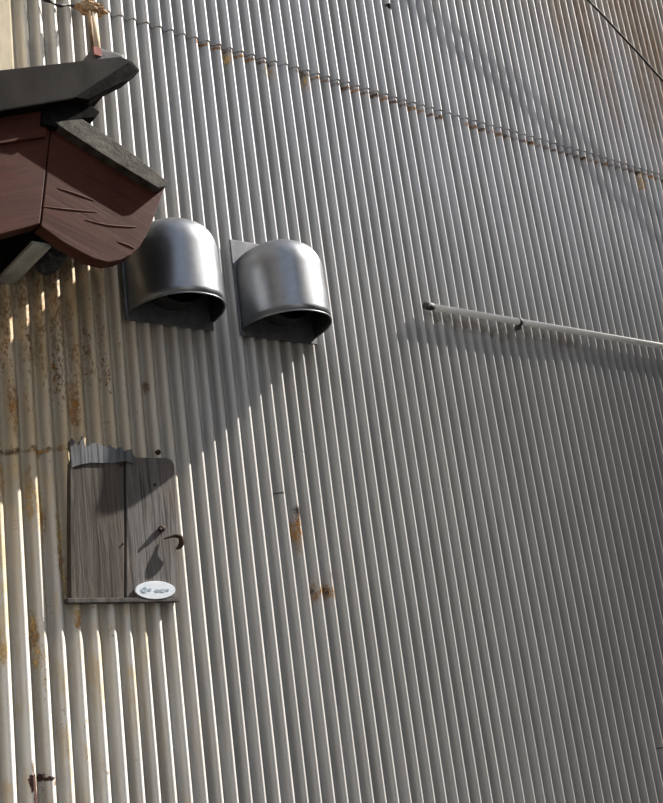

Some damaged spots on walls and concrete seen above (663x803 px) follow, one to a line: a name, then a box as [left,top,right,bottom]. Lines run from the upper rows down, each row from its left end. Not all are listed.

rust [196,39,270,74]
rust [298,71,443,119]
rust [544,146,663,189]
rust [49,350,79,425]
rust [290,507,302,544]